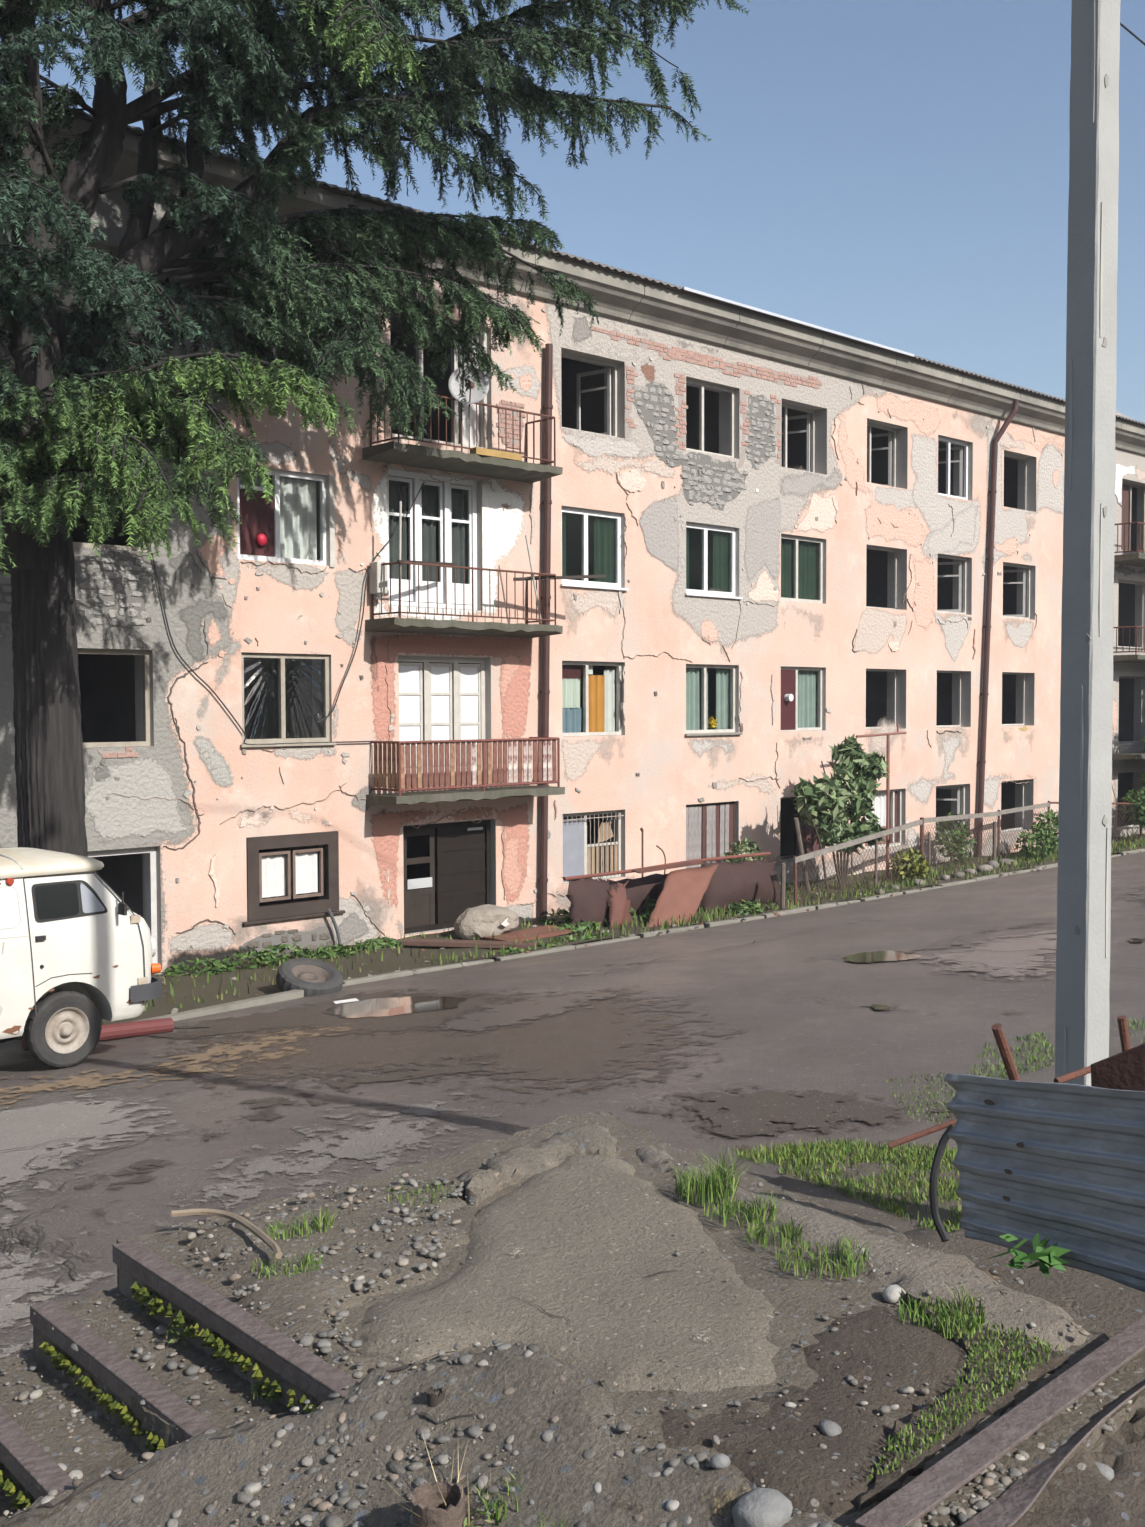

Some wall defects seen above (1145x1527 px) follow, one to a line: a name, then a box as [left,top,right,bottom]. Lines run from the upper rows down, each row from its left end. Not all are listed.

spalling [90,190,130,245]
spalling [148,201,169,236]
spalling [496,302,1065,661]
spalling [0,623,18,848]
spalling [73,437,526,971]
spalling [506,889,538,922]